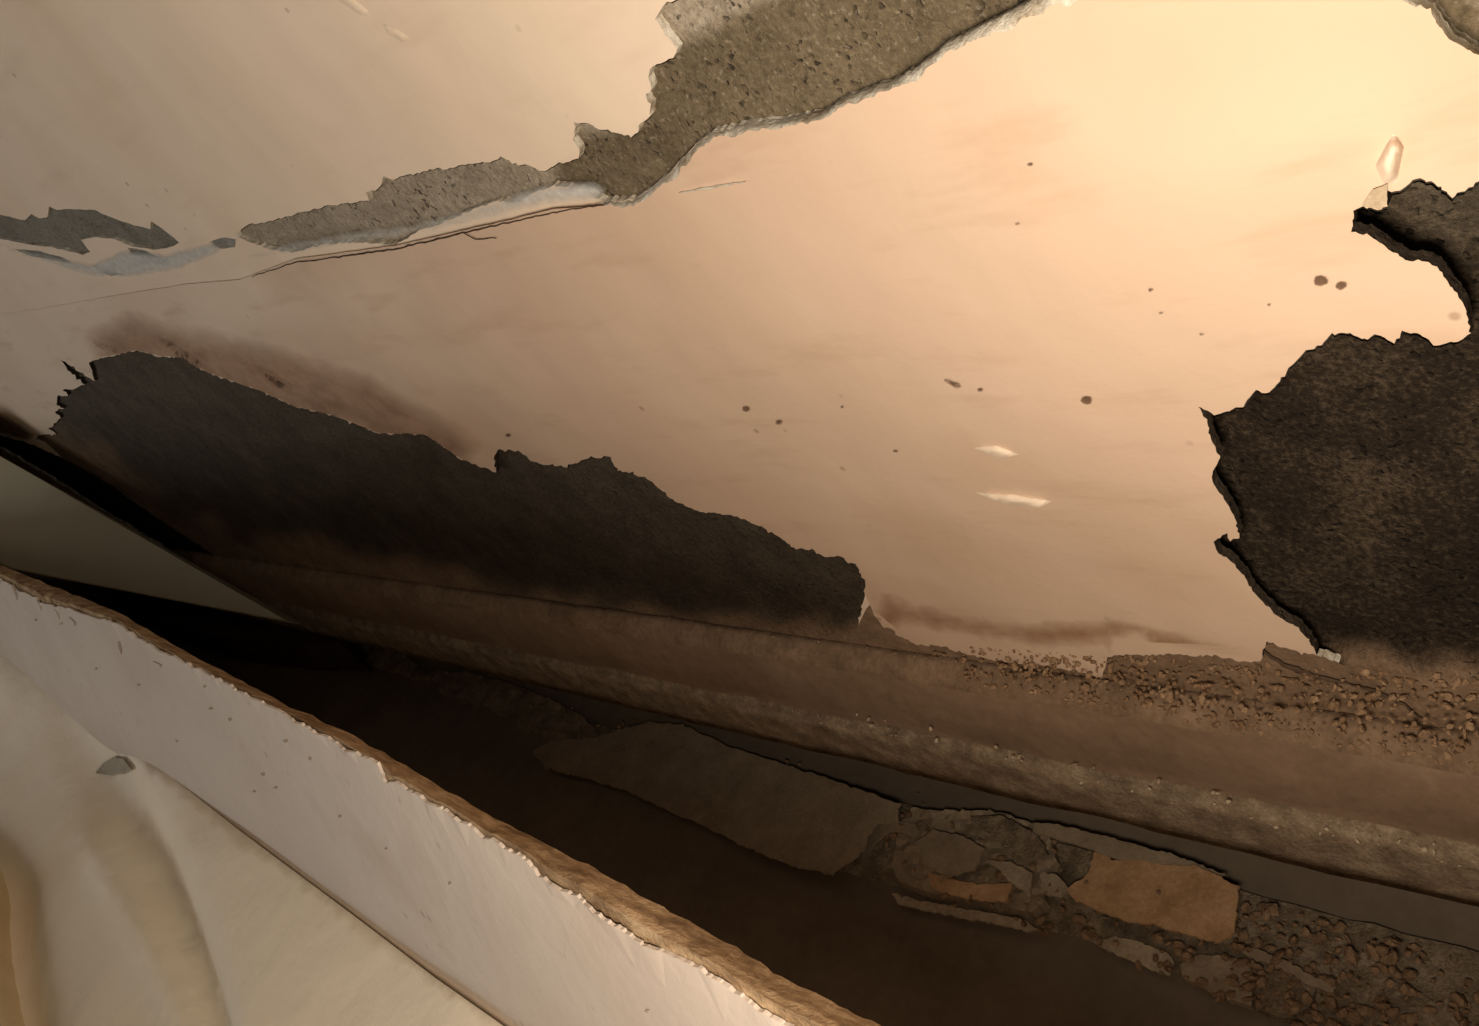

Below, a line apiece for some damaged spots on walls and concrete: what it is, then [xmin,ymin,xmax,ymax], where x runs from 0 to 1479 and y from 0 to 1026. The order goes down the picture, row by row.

flaking render [1439,0,1479,42]
flaking render [0,208,178,261]
flaking render [212,0,1028,249]
peeling [1362,184,1388,210]
flaking render [37,351,866,642]
leakage [1212,182,1479,680]
peeling [891,823,1337,994]